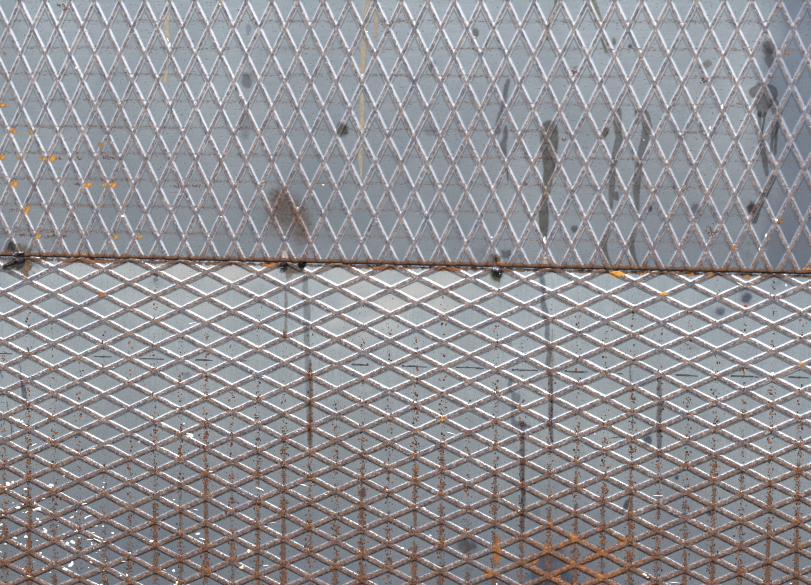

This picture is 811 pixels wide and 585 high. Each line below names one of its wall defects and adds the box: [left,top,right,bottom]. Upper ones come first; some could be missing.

rust [0,248,811,326]
rust [0,322,87,585]
rust [97,462,114,585]
rust [122,332,319,585]
rust [327,330,452,585]
rust [461,309,727,585]
rust [732,367,753,585]
rust [758,361,810,585]